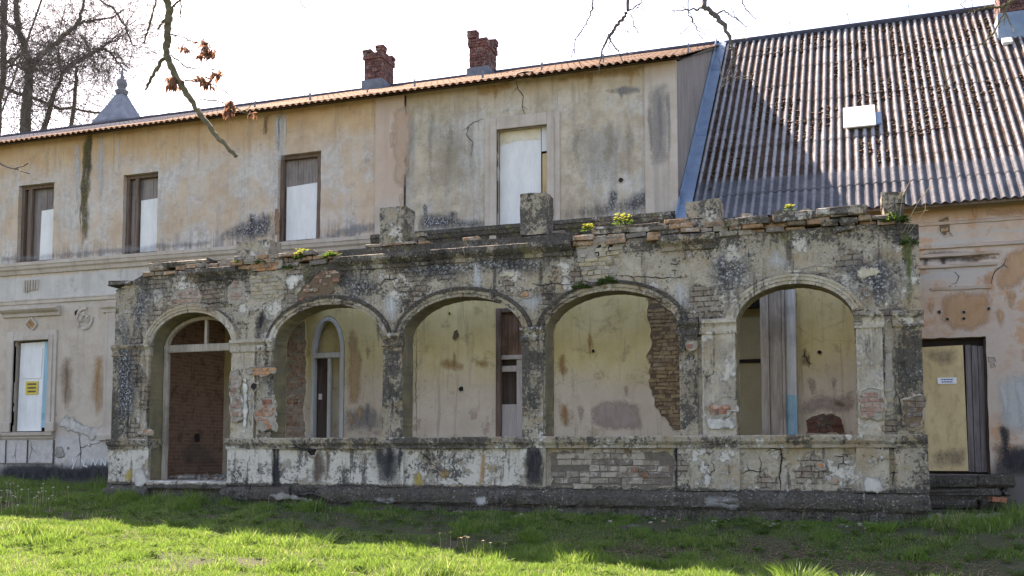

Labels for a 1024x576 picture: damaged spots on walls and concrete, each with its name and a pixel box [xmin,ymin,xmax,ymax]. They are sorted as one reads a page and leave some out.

damp [75,134,104,235]
peeling [929,250,1024,331]
spalling [225,257,343,438]
damp [376,448,402,482]
damp [526,448,541,486]
peeling [578,386,641,429]
spalling [644,298,698,432]
crack [740,448,785,490]
spalling [802,351,927,435]
damp [997,376,1024,475]